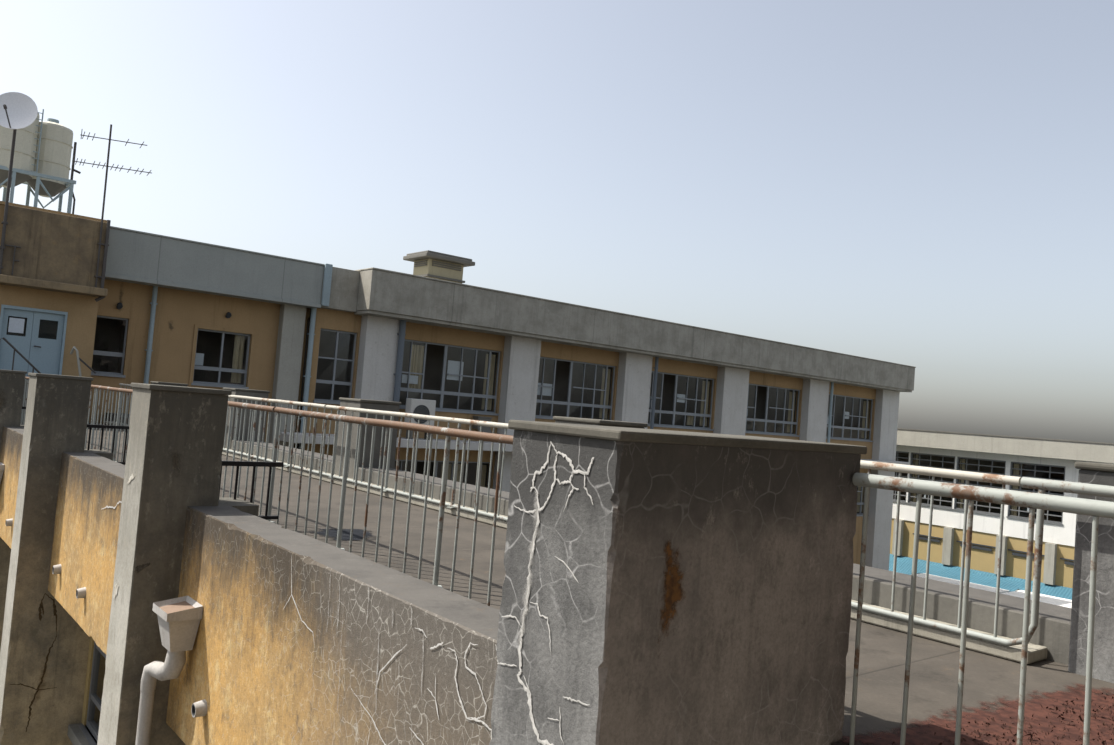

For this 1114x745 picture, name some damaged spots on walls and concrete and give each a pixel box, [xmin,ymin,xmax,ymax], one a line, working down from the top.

crack [10,593,57,732]
crack [285,559,315,646]
crack [351,441,594,745]
corrosion [658,541,683,641]